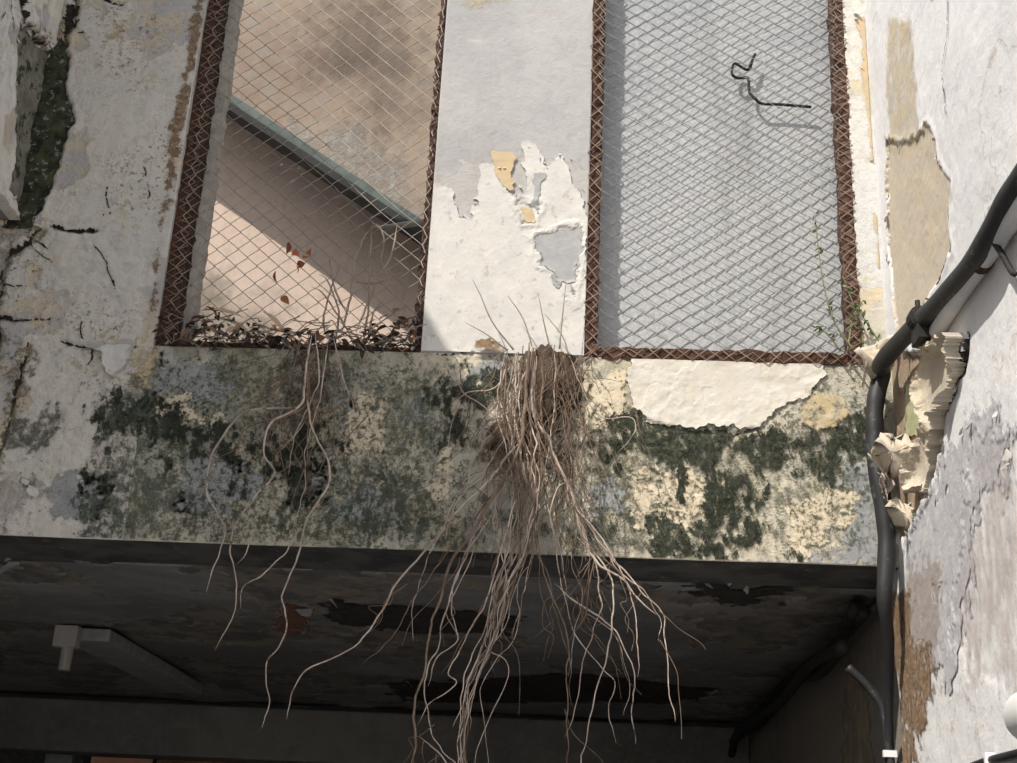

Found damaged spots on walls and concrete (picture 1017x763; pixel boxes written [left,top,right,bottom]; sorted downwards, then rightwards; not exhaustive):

crack [2,0,84,52]
rust [158,0,204,232]
peeling [853,12,874,162]
crack [0,187,116,492]
peeling [78,338,134,378]
rust [150,247,160,311]
peeling [410,140,588,391]
peeling [576,359,827,433]
peeling [854,119,951,380]